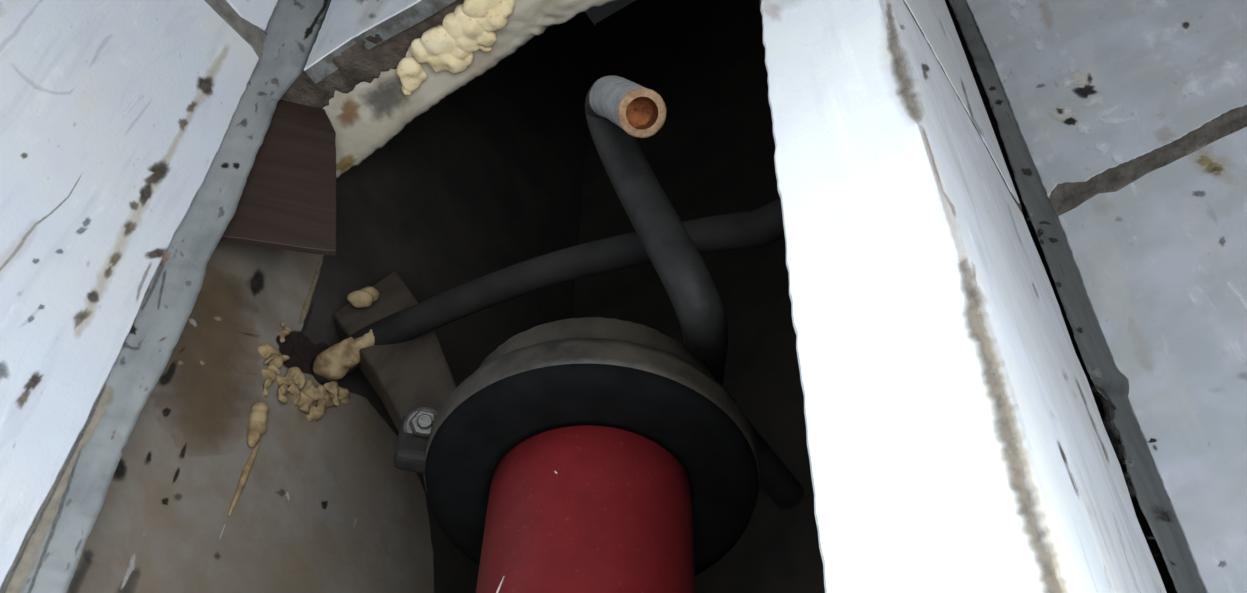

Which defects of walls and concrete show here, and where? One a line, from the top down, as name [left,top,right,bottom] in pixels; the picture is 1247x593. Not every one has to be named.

leakage [887,3,922,121]
corrosion [179,78,212,129]
corrosion [125,162,169,234]
corrosion [105,253,120,277]
corrosion [75,291,98,325]
leakage [960,258,1065,593]